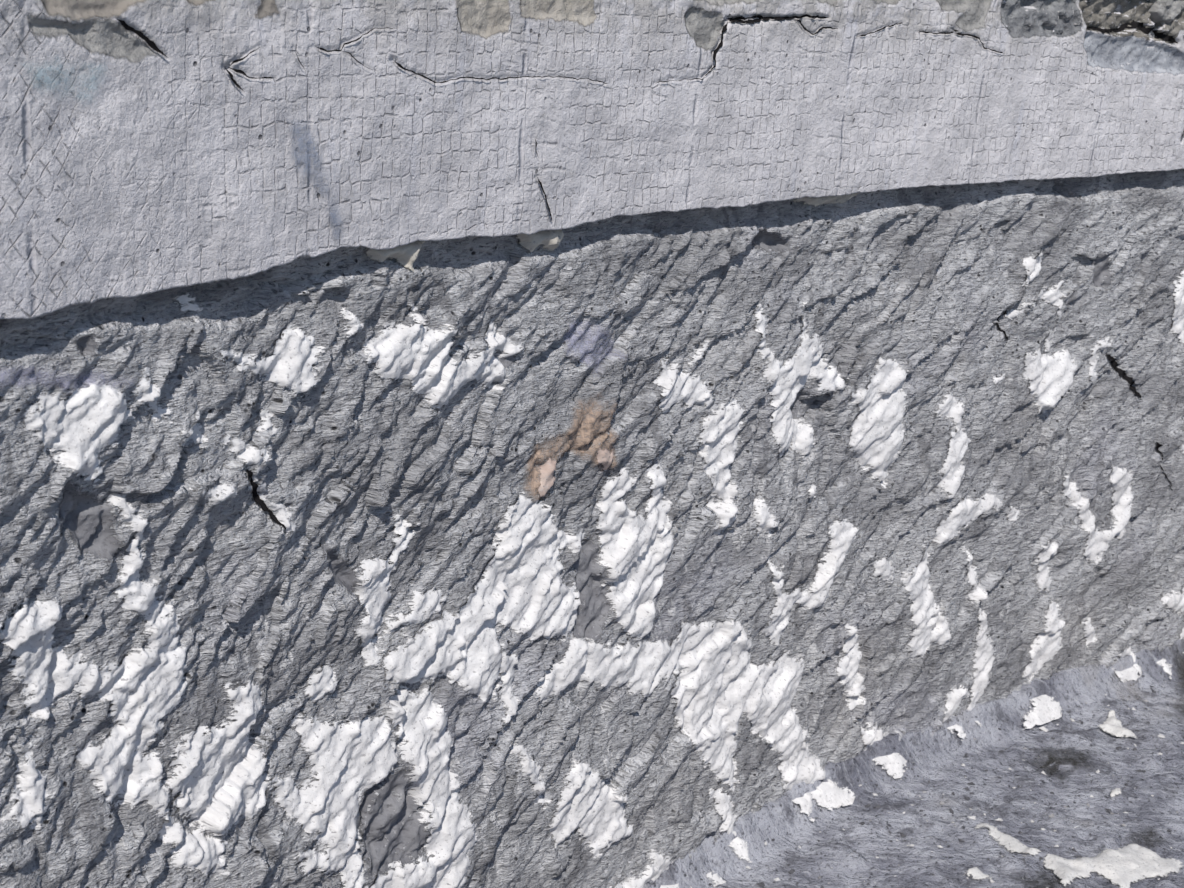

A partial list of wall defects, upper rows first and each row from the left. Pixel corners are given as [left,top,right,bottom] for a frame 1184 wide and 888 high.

crack [116,18,168,58]
crack [225,47,273,93]
crack [296,27,607,84]
crack [657,14,1005,83]
crack [1086,20,1178,43]
flaking render [219,324,325,397]
flaking render [338,302,524,417]
flaking render [754,302,909,489]
flaking render [993,252,1115,415]
corrosion [528,403,616,497]
flaking render [871,387,1020,741]
flaking render [0,340,859,888]